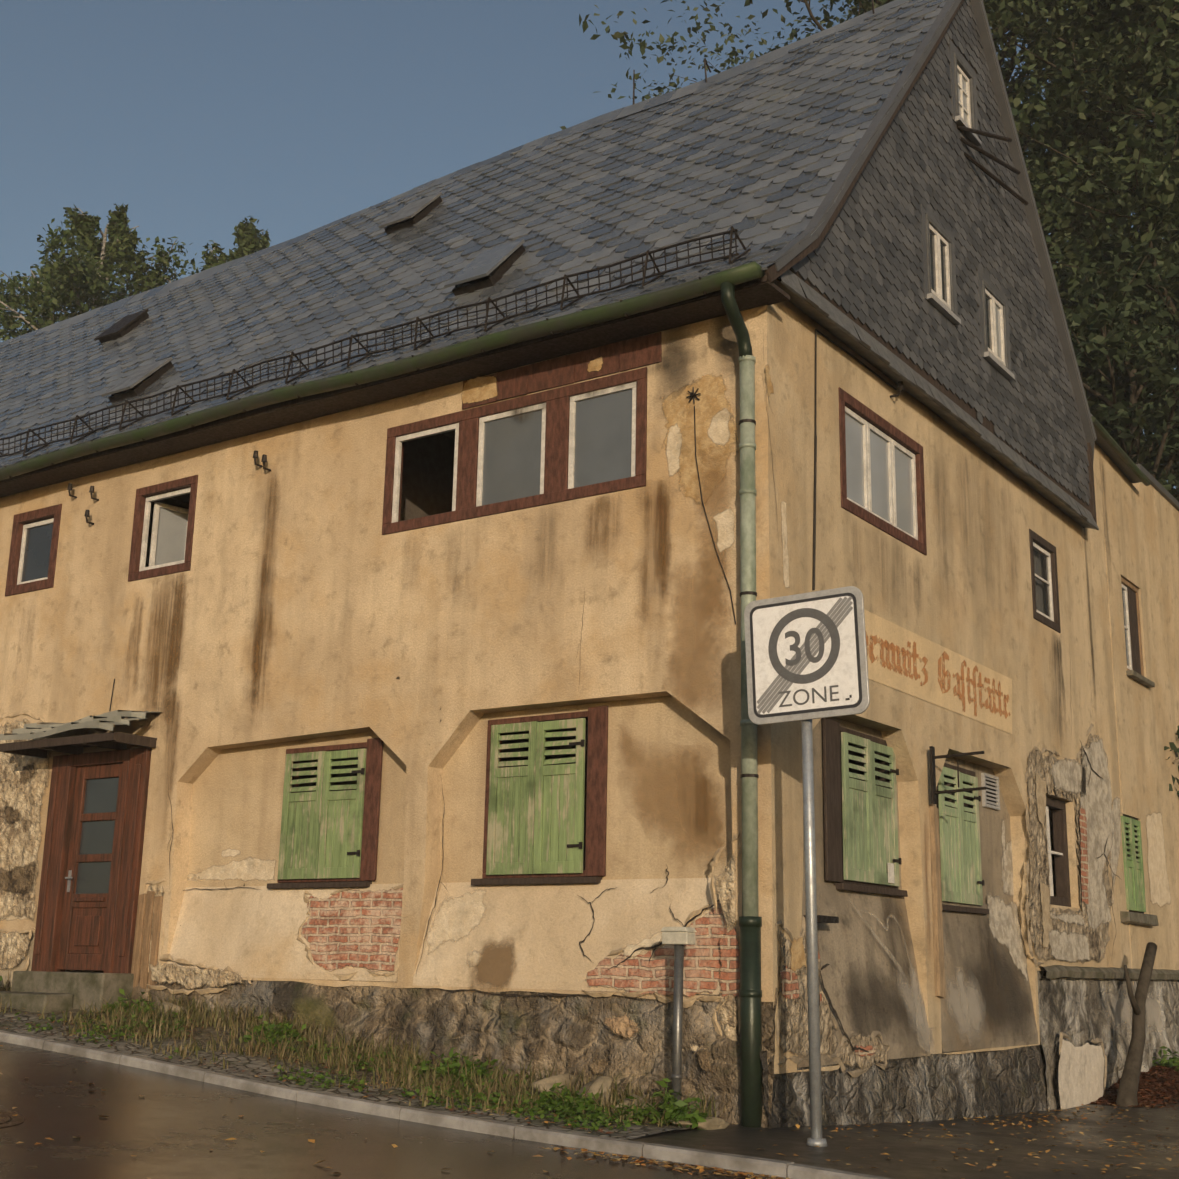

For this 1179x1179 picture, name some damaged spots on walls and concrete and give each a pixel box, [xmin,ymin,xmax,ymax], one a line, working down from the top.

peeling [662,374,737,505]
water stain [150,582,184,708]
water stain [253,532,273,697]
spalling [0,710,53,972]
spalling [296,884,403,980]
water stain [471,944,514,988]
crack [416,775,719,1012]
spalling [582,833,742,1041]
spalling [775,915,890,1077]
water stain [850,972,923,1034]
water stain [958,941,1027,1024]
spalling [987,723,1121,981]